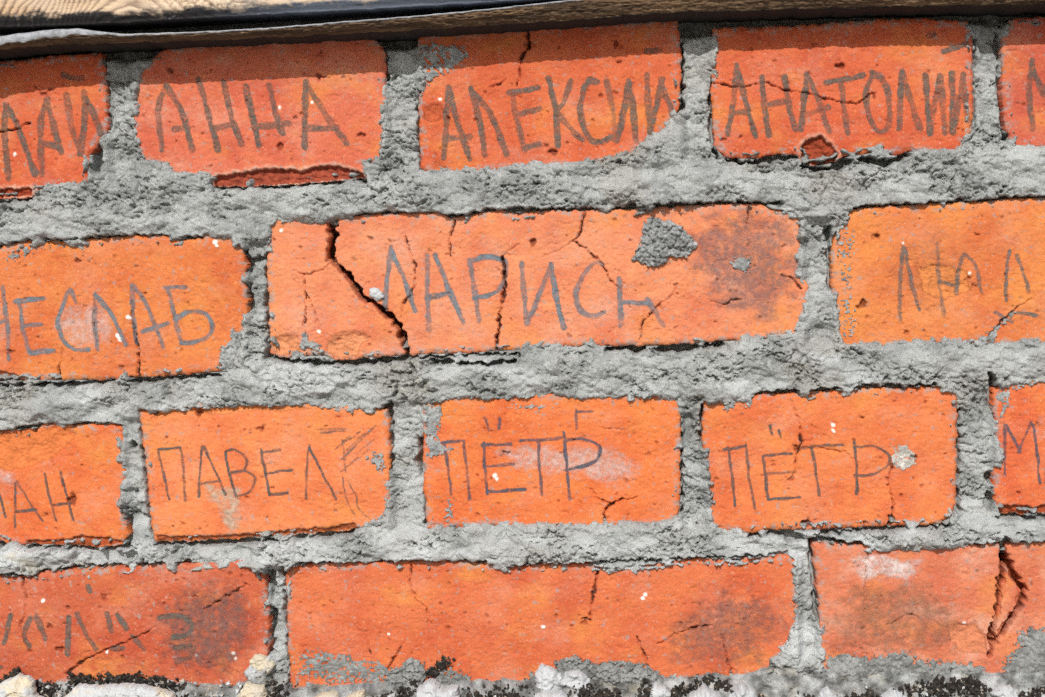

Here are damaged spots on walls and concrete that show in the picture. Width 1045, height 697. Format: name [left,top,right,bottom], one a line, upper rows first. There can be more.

crack [498,32,531,86]
spalling [0,188,32,198]
spalling [214,166,365,186]
spalling [801,136,837,164]
crack [330,225,417,350]
crack [987,552,1024,653]